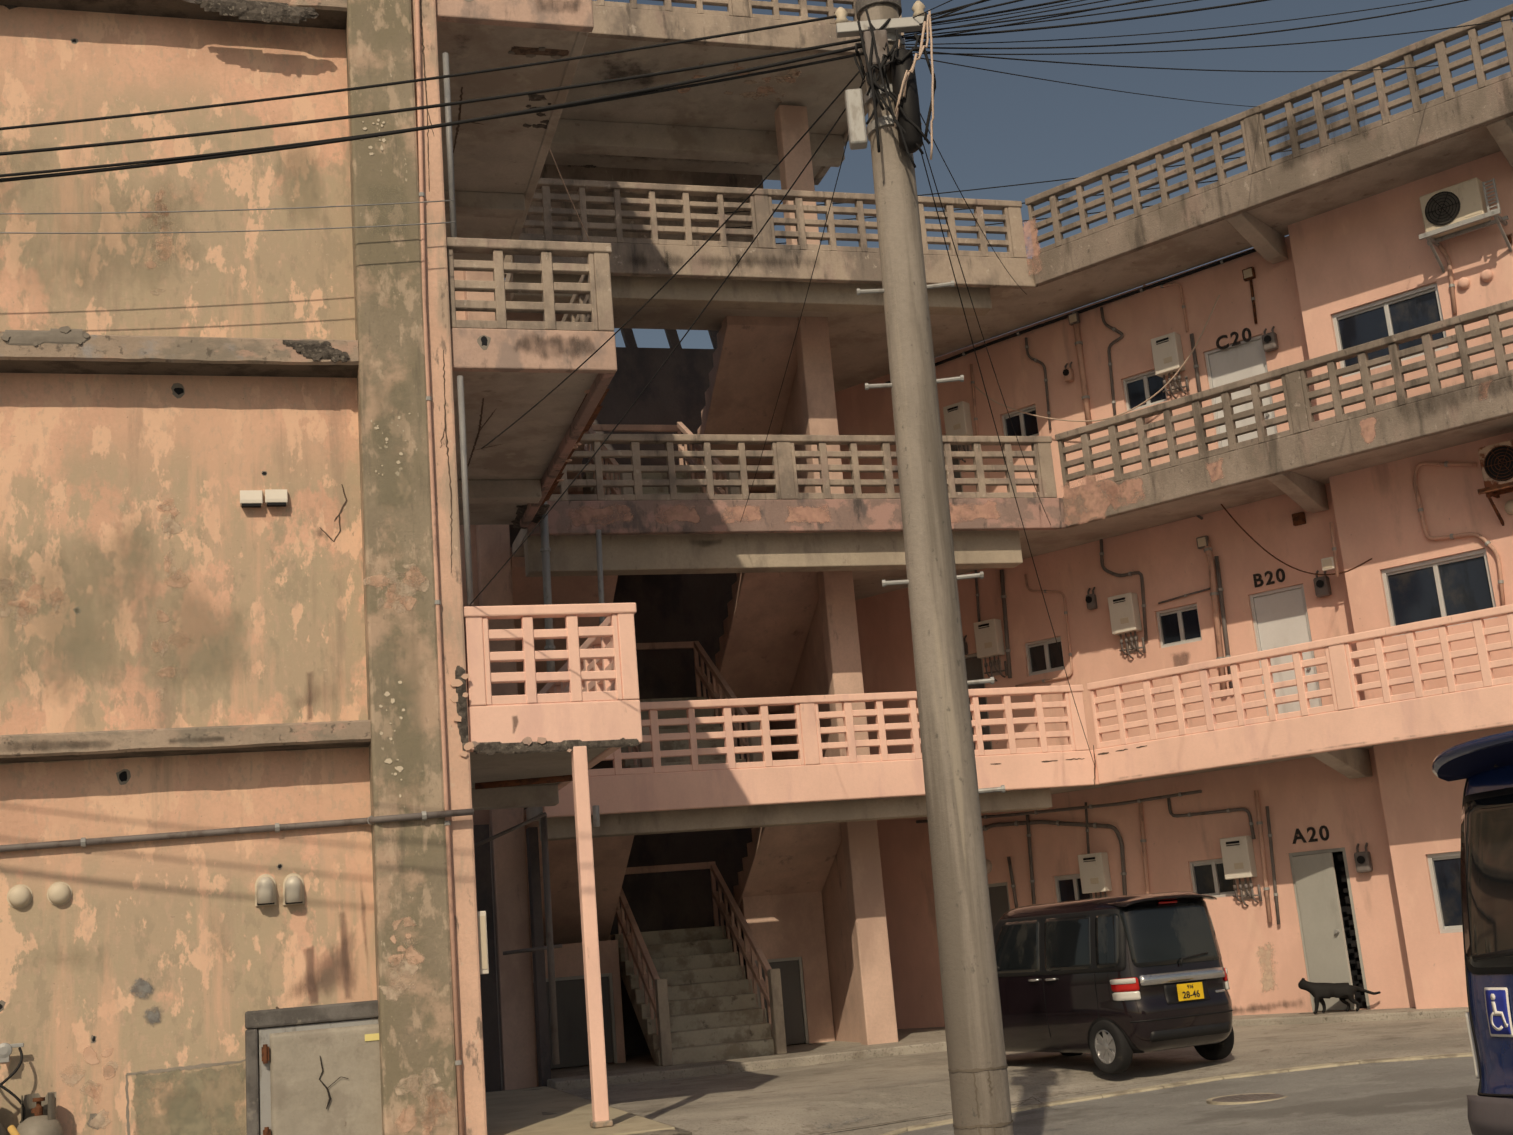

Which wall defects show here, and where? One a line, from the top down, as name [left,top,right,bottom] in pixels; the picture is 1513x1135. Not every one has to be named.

spalling [194,0,319,23]
spalling [283,340,349,363]
crack [319,484,348,542]
spalling [450,666,640,757]
damp [307,938,348,1002]